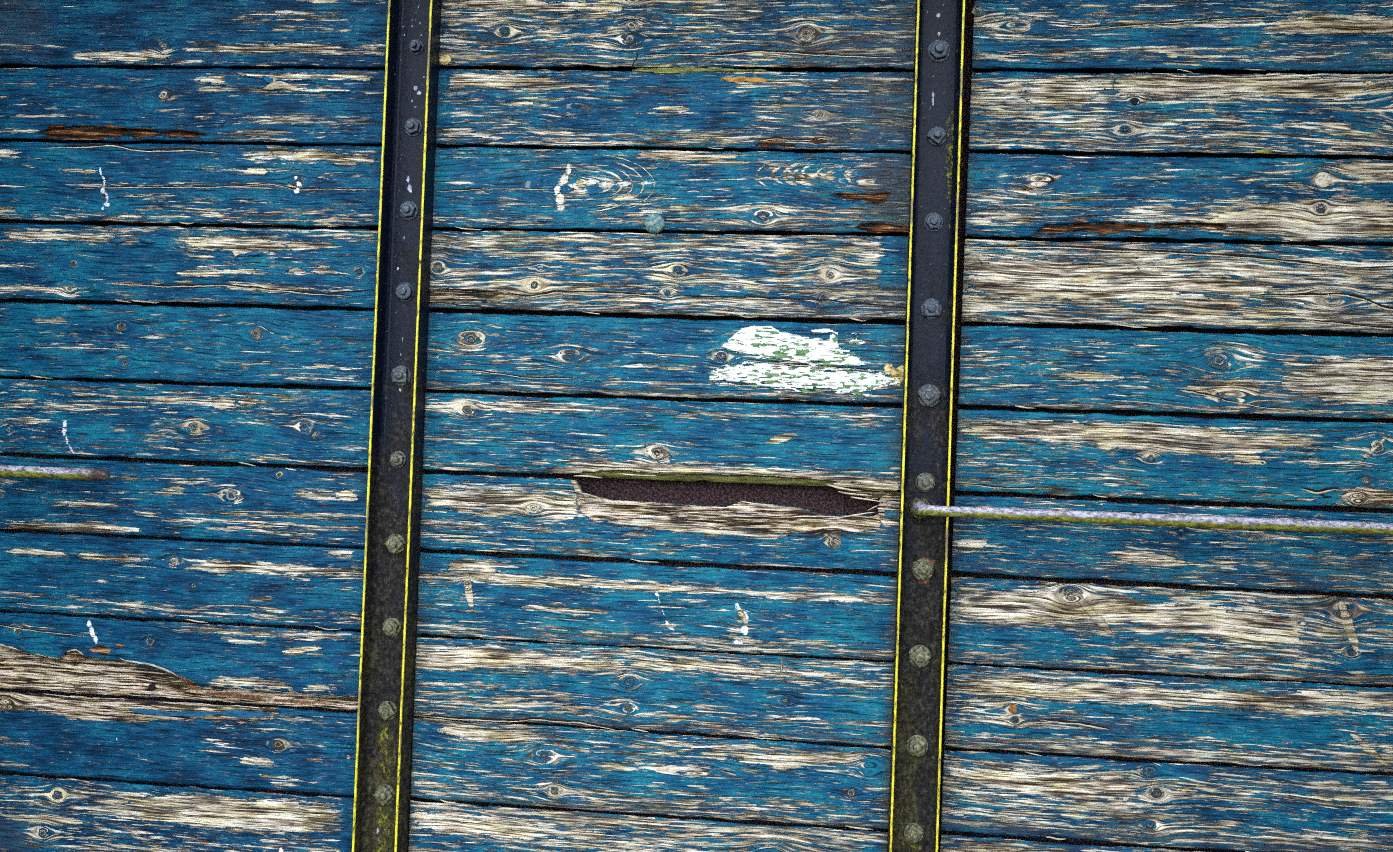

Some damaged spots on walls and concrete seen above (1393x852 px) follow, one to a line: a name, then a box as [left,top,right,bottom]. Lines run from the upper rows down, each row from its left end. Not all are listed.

peeling [90,643,133,655]
peeling [211,674,331,690]
peeling [129,708,271,718]